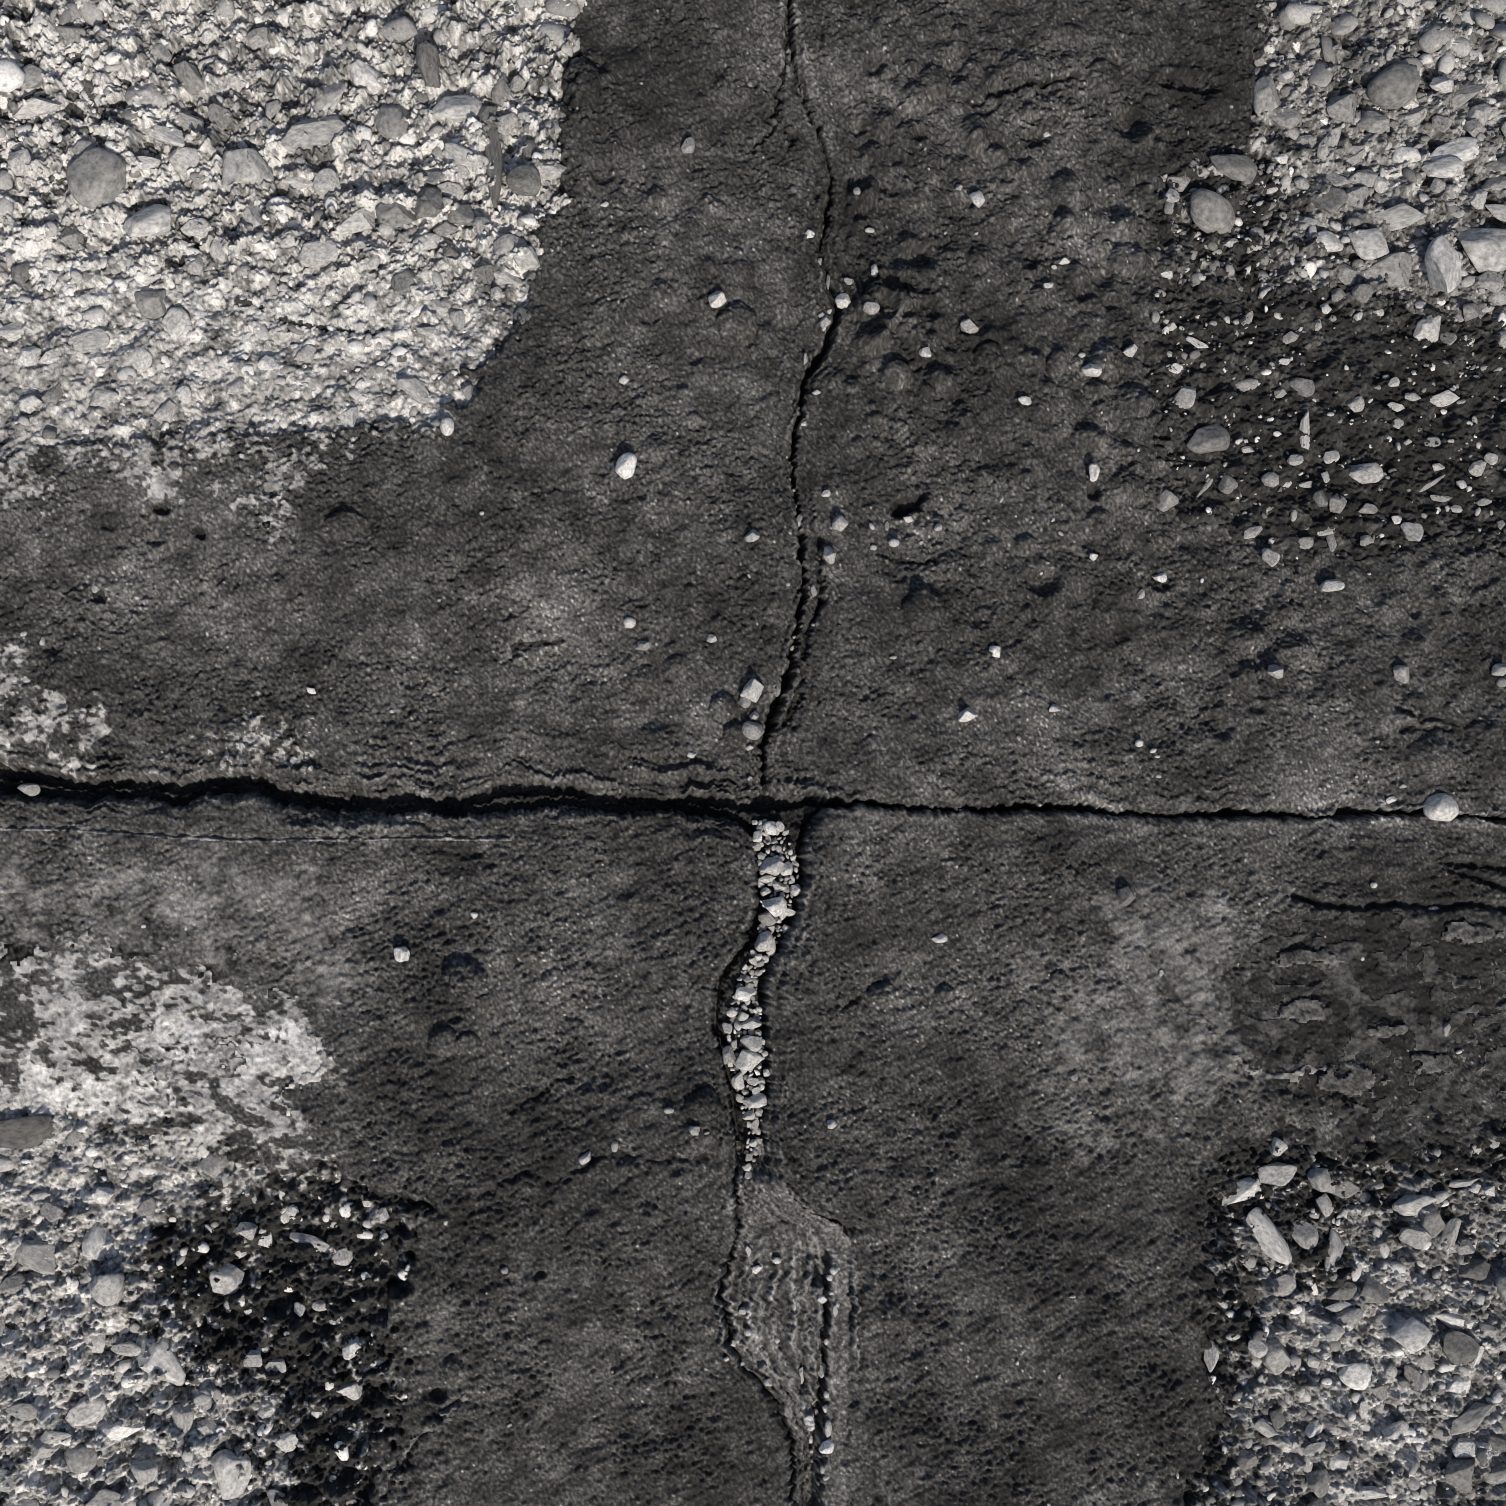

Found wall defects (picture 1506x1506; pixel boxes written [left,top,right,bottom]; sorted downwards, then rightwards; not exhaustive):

crack [971,70,1081,116]
crack [152,222,235,284]
spalling [0,0,587,462]
crack [234,298,385,336]
spalling [1143,0,1506,578]
spalling [153,503,170,515]
crack [509,637,564,660]
crack [783,536,827,728]
crack [0,825,512,843]
crack [1290,860,1506,913]
spalling [1190,903,1506,1506]
spalling [0,1092,468,1506]